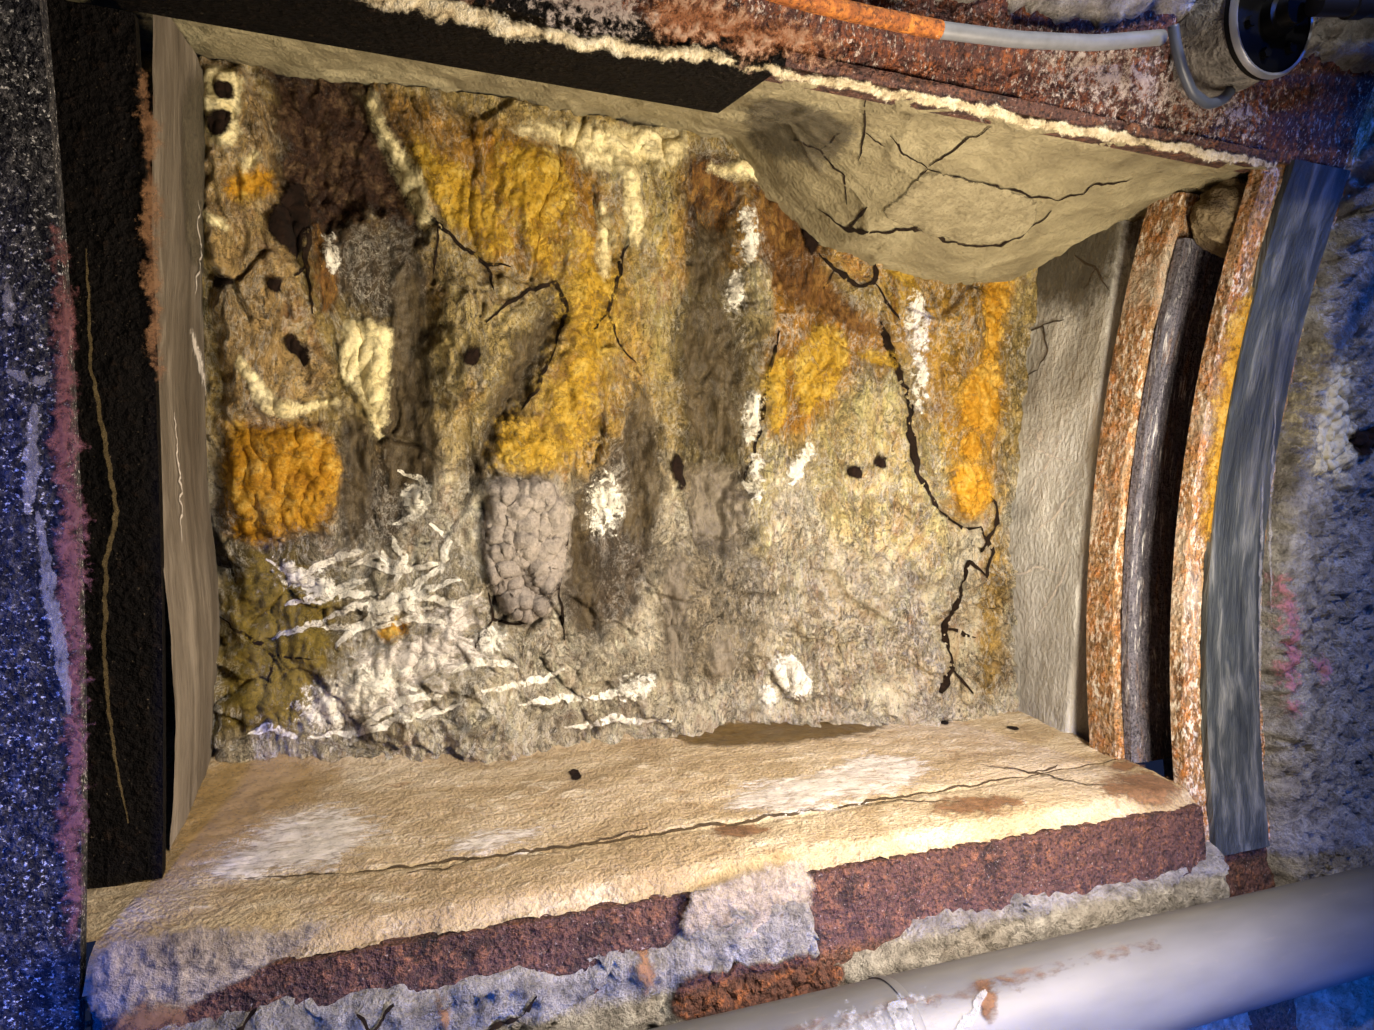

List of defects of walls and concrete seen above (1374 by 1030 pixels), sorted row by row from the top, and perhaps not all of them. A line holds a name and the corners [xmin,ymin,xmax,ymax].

corrosion [646,0,840,67]
damp [192,333,206,389]
crack [295,184,314,314]
crack [410,199,636,410]
crack [792,100,1131,694]
corrosion [1200,296,1252,540]
damp [220,274,884,746]
damp [166,753,388,880]
damp [452,826,541,856]
crack [241,758,1139,879]
corrosion [1100,759,1184,805]
crack [356,1003,394,1030]